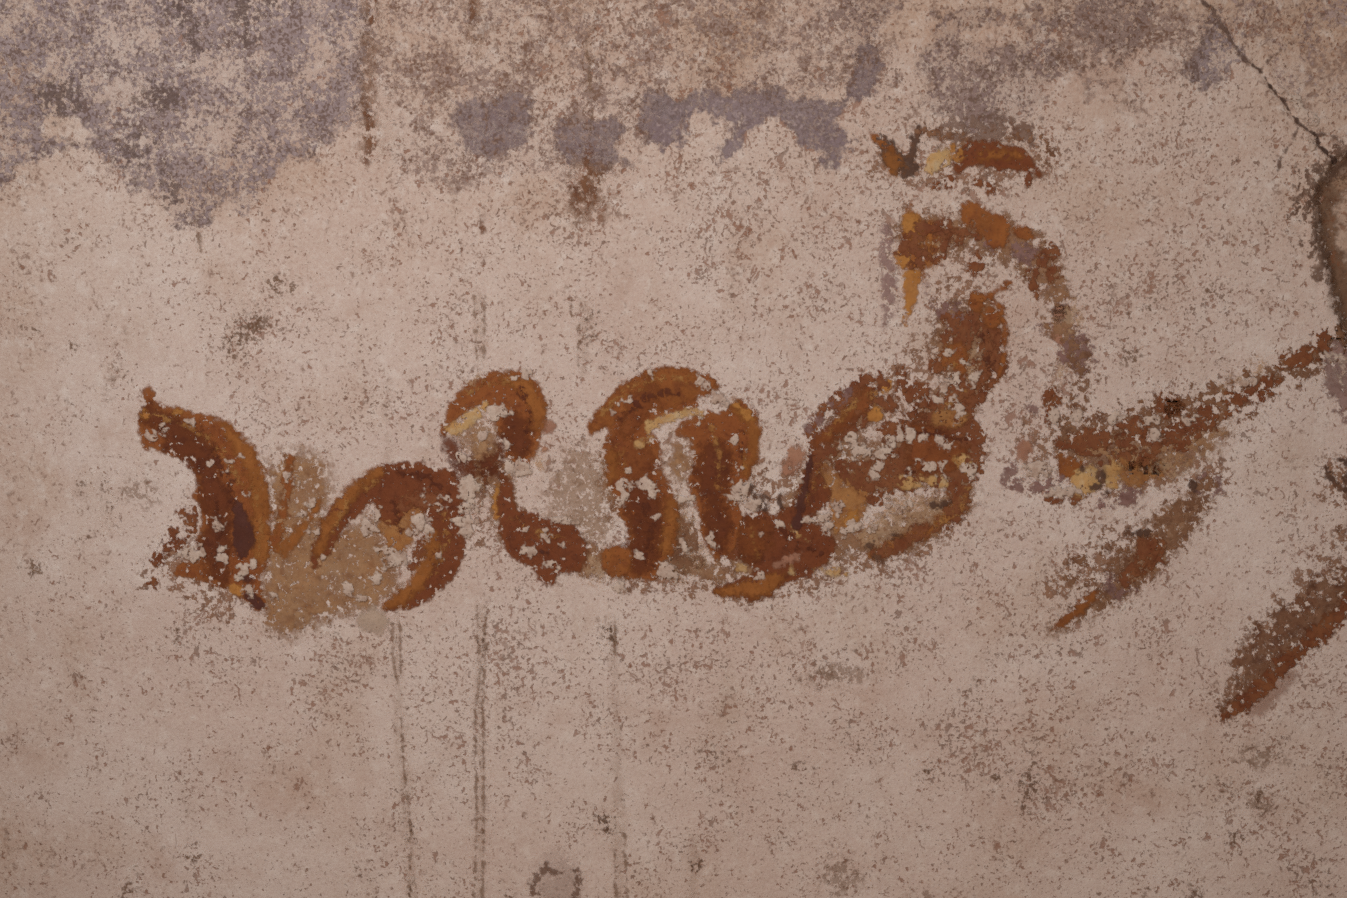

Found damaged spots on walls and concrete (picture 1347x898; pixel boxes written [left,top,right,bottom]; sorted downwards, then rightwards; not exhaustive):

damp [39,76,85,117]
crack [1201,0,1342,171]
damp [161,181,184,206]